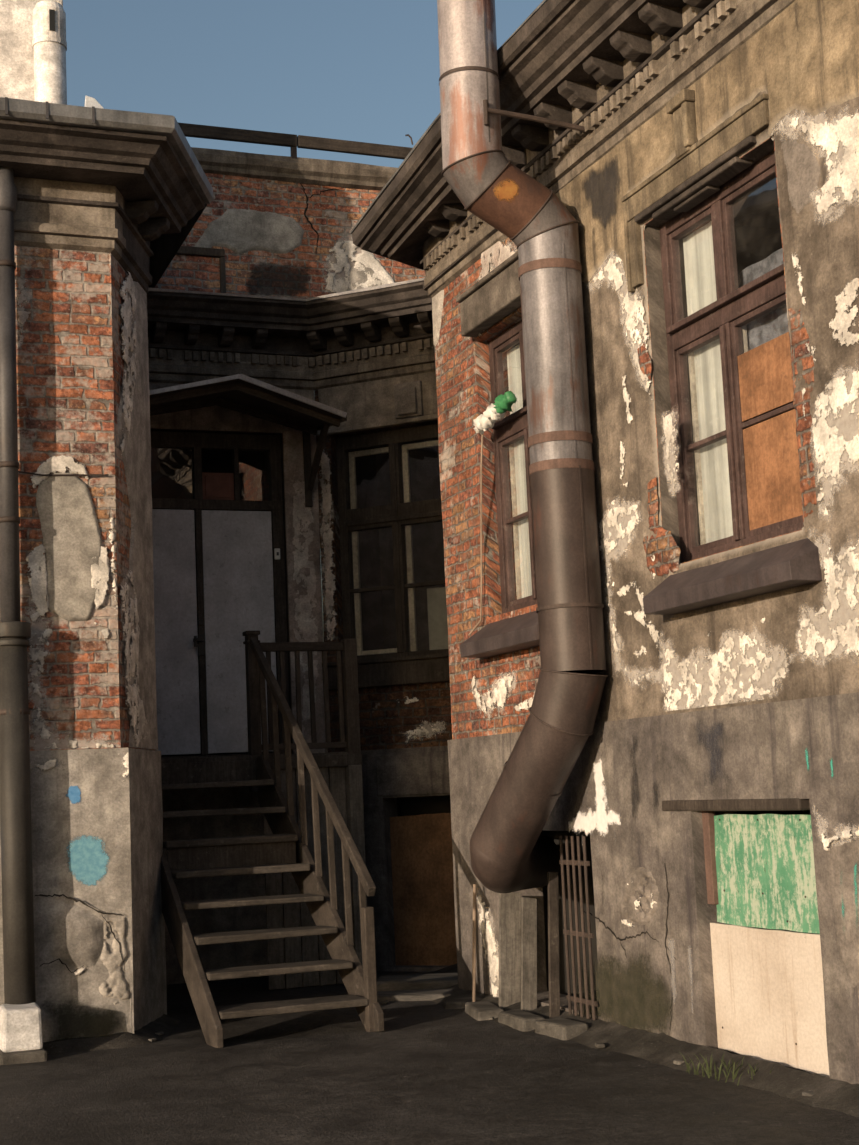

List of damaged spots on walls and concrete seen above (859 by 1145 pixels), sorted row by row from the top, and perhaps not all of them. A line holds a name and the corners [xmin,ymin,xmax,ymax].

peeling [120,272,137,455]
crack [300,183,344,252]
peeling [325,237,395,293]
rust [494,180,518,201]
peeling [587,253,652,424]
peeling [788,254,859,517]
peeling [599,411,859,711]
peeling [27,517,148,779]
crack [35,894,125,973]
peeling [478,896,499,997]
crack [584,867,676,1027]